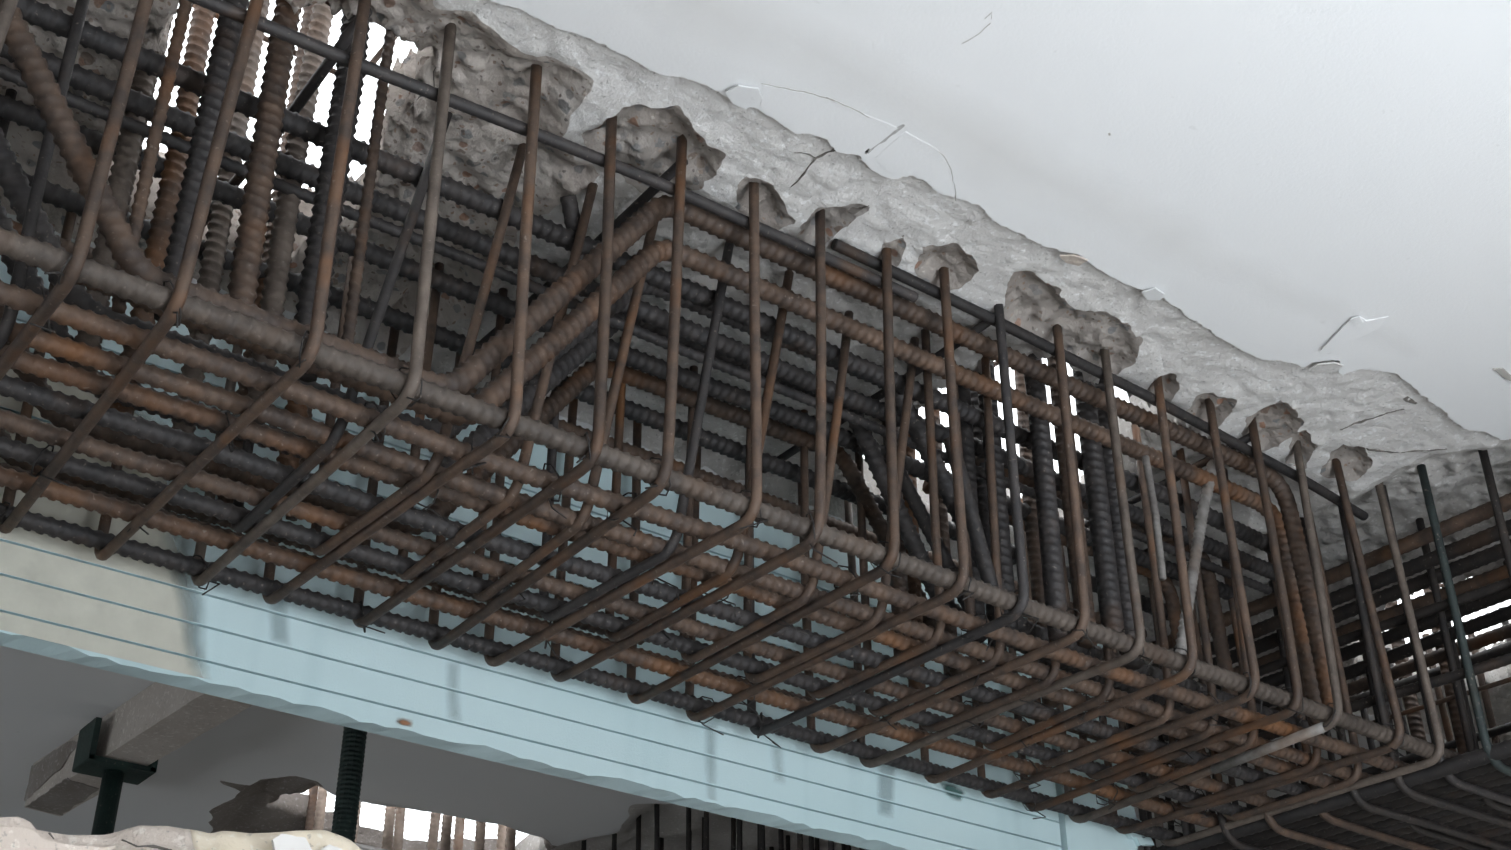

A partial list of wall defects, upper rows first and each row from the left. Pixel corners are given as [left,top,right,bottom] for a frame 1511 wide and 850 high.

spalling [0,57,40,110]
spalling [6,121,79,194]
crack [761,83,905,188]
spalling [27,0,1511,690]
leakage [0,395,49,423]
leakage [47,378,99,404]
leakage [5,430,164,484]
leakage [0,486,201,678]
spalling [1340,626,1511,762]
spalling [0,776,859,850]